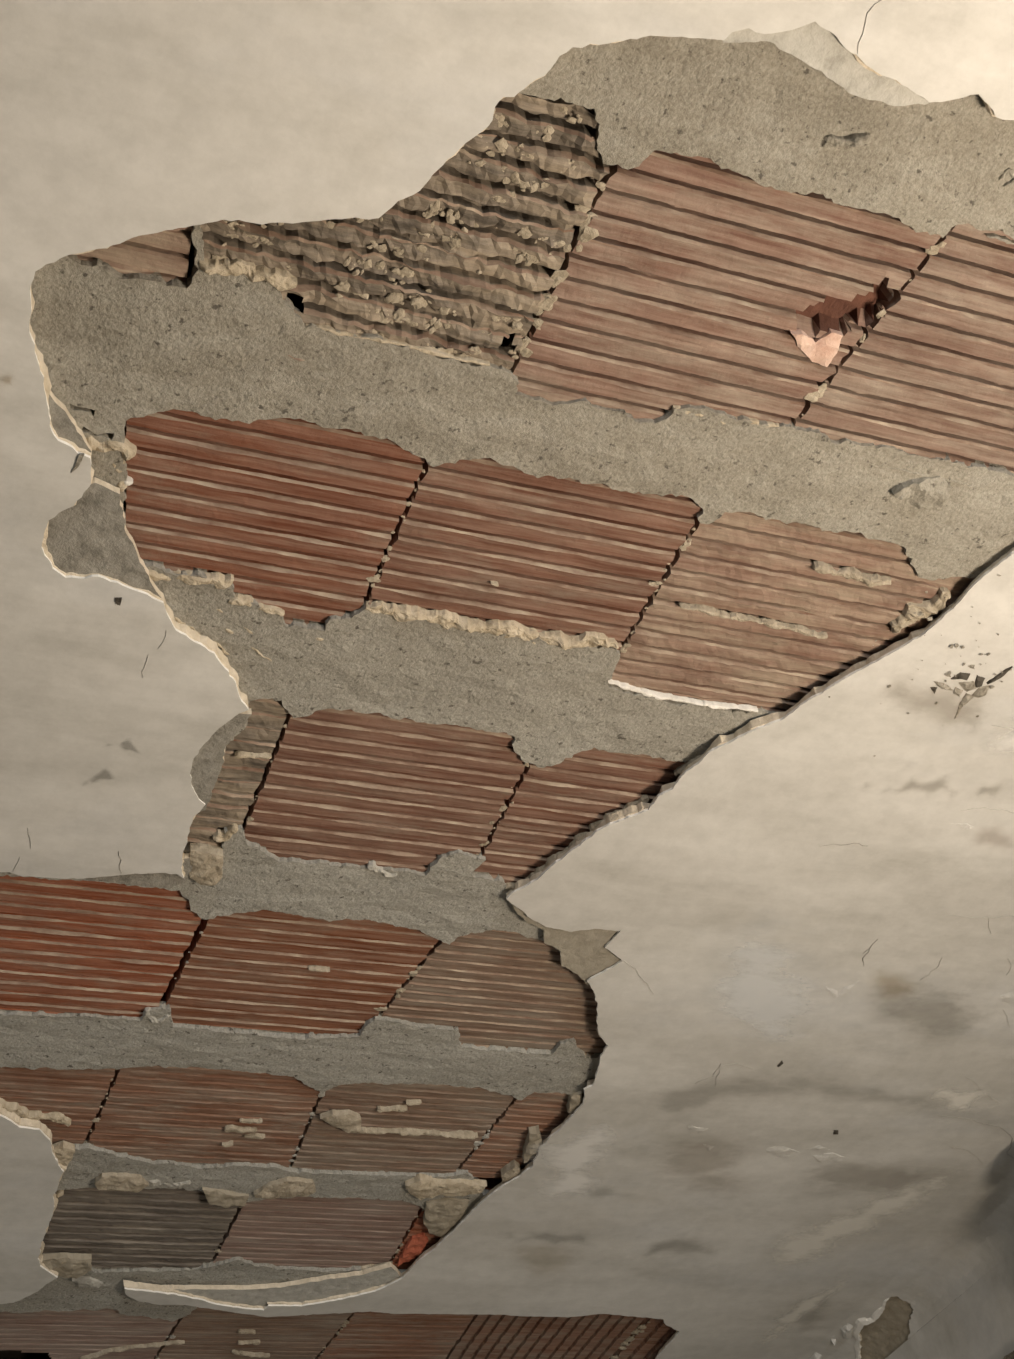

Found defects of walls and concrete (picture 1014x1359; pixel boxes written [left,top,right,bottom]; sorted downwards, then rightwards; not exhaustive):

flaking render [722,22,932,106]
flaking render [515,251,540,266]
flaking render [393,308,418,326]
flaking render [534,293,558,316]
flaking render [518,336,533,358]
flaking render [790,329,843,367]
flaking render [46,477,162,598]
flaking render [190,708,252,811]
flaking render [85,853,193,889]
flaking render [512,904,621,986]
flaking render [173,1262,401,1306]
flaking render [315,1311,677,1359]